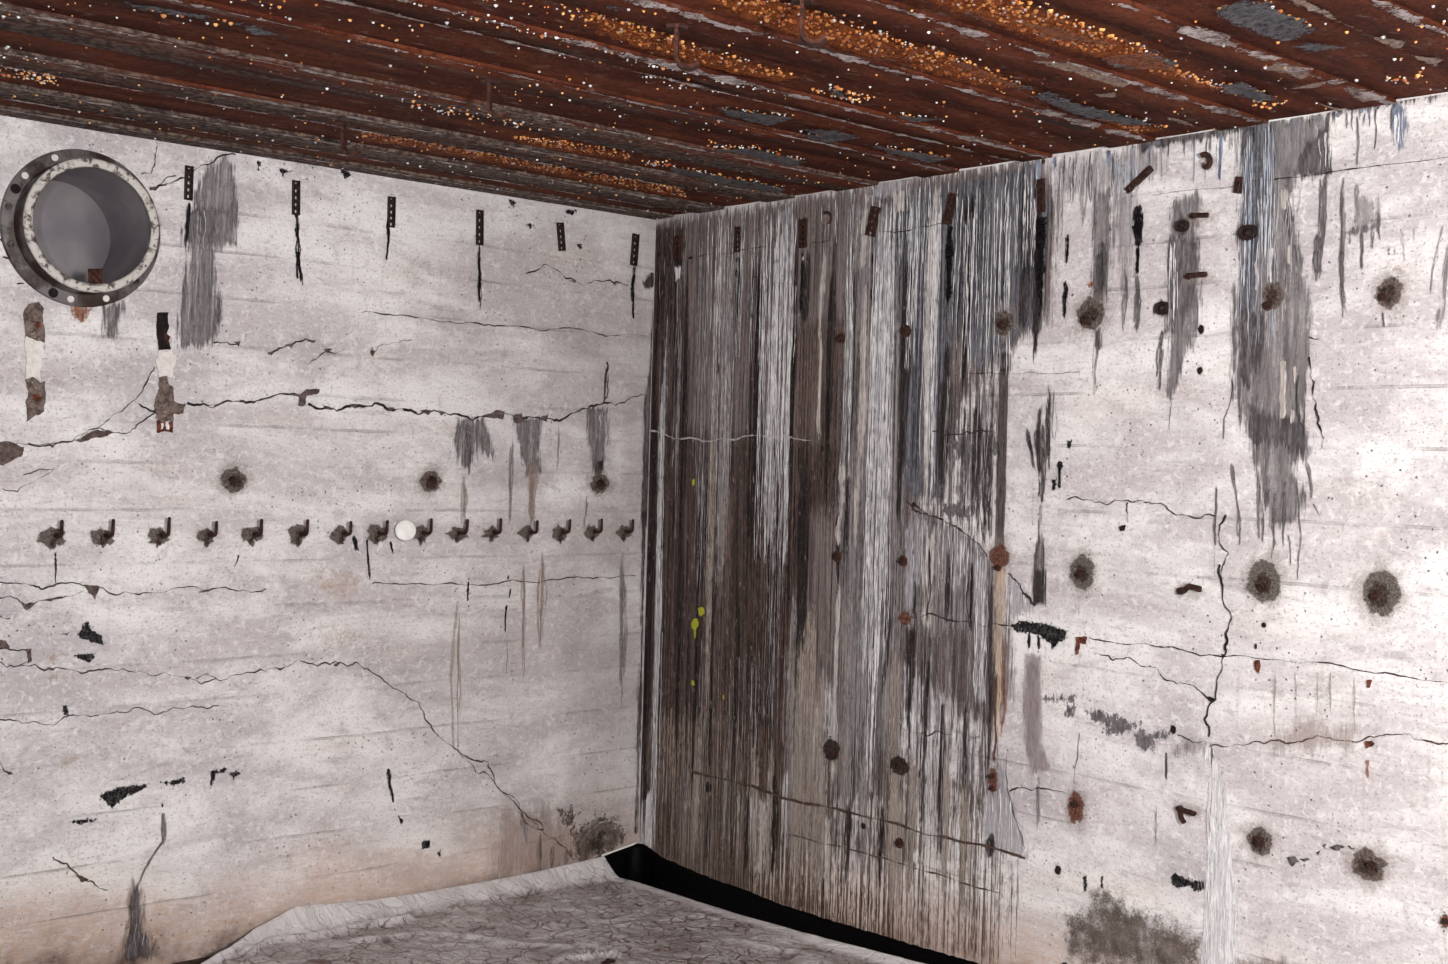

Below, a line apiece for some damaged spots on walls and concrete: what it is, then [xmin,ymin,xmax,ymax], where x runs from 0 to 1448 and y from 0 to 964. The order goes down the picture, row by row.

water stain [0,54,684,189]
rust [707,0,1020,89]
rust [1036,96,1162,135]
rust [1214,1,1314,41]
water stain [177,156,239,348]
spalling [23,302,46,421]
crack [0,311,646,492]
water stain [358,0,1415,964]
crack [1067,496,1448,747]
crack [0,581,573,859]
crack [52,857,107,891]
water stain [124,814,167,961]